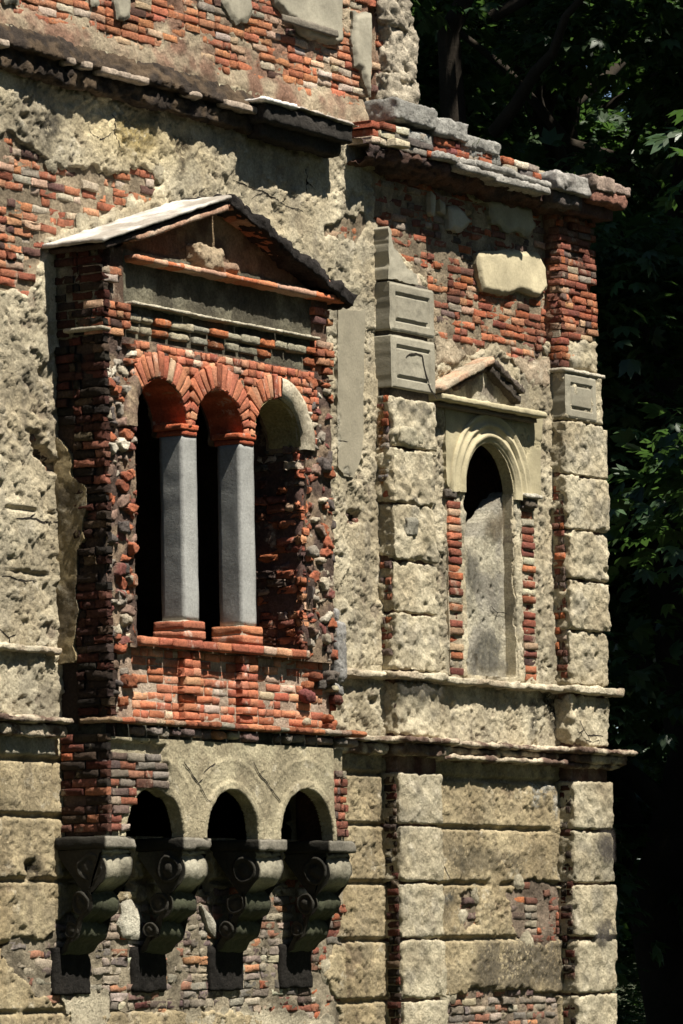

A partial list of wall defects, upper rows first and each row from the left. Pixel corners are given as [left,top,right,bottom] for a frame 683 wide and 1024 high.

peeling [88,0,131,22]
peeling [221,0,252,26]
peeling [271,0,372,98]
crack [234,169,313,211]
spalling [0,131,167,299]
spalling [324,170,598,388]
crack [184,762,216,801]